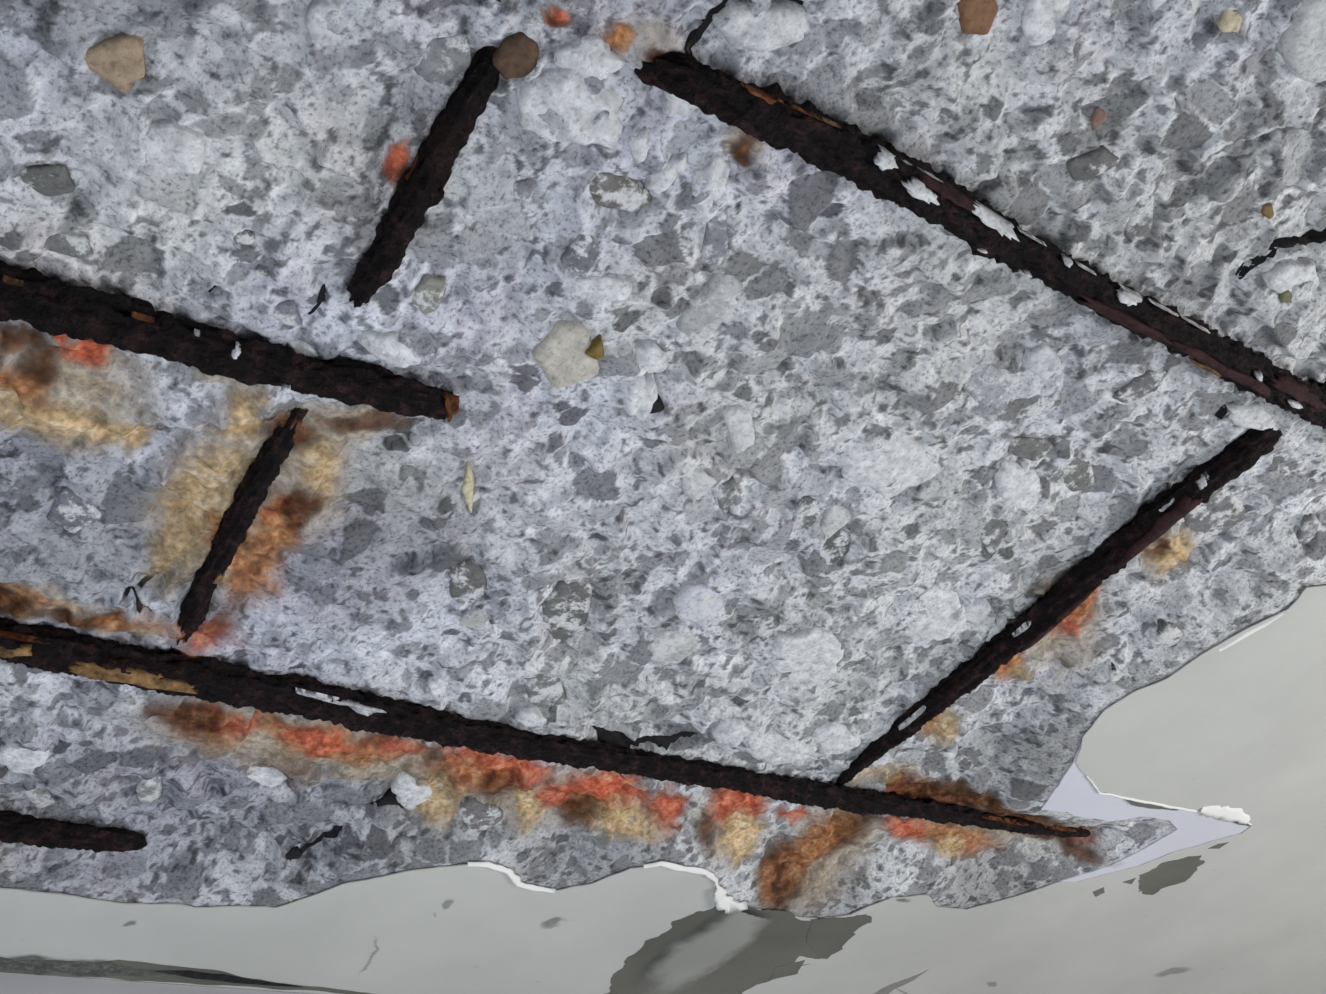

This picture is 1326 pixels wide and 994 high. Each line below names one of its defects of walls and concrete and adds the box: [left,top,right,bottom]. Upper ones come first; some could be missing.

spalling [347,46,500,309]
spalling [515,67,623,149]
spalling [634,0,1326,430]
crack [1235,227,1326,280]
rust [0,326,148,447]
spalling [0,260,460,422]
rust [0,375,407,647]
spalling [834,428,1286,786]
rust [147,702,419,775]
spalling [0,613,1091,914]
rust [417,746,686,838]
rust [698,766,1098,910]